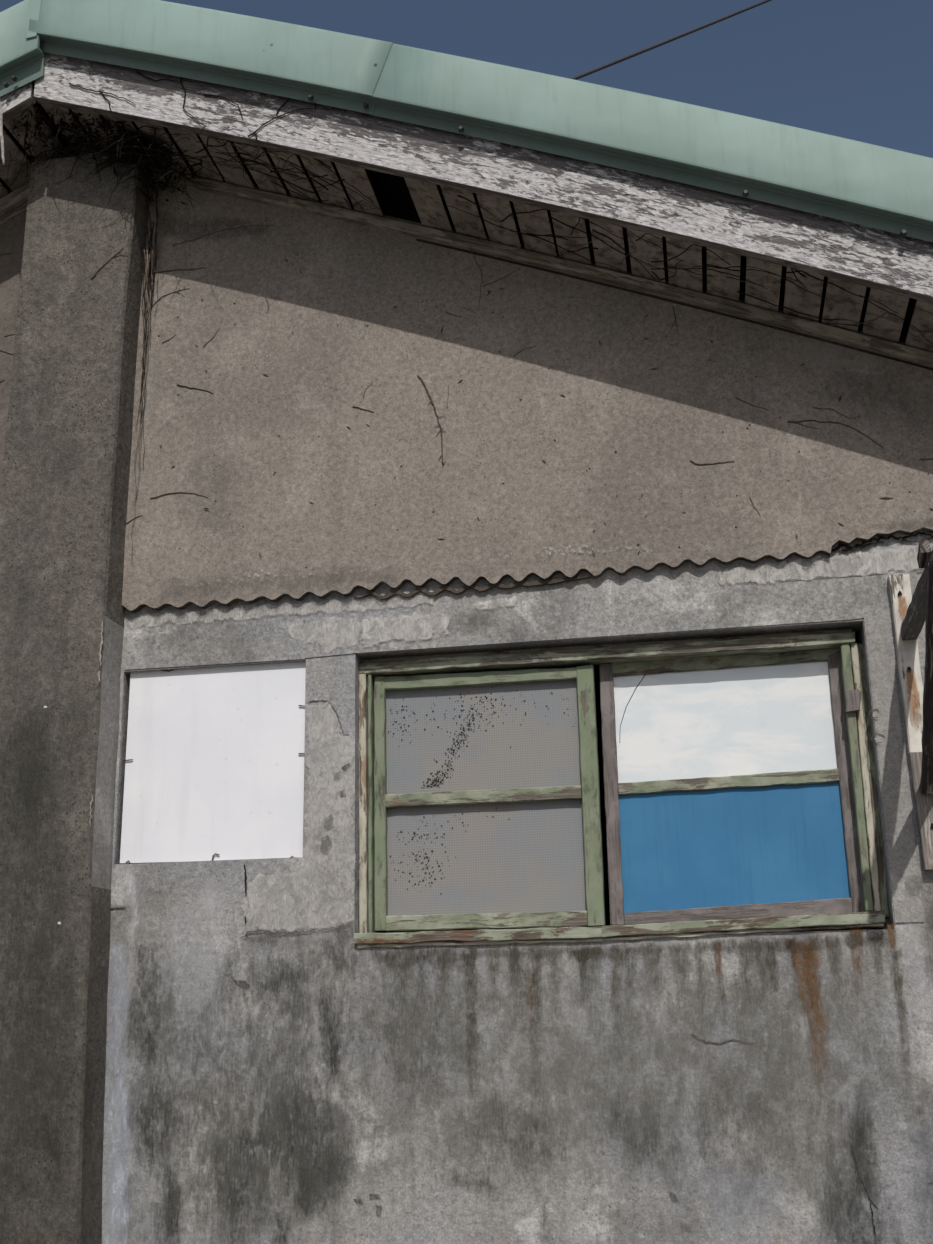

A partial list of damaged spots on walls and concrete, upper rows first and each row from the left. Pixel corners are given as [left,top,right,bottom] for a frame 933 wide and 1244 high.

crack [243,864,251,925]
leakage [104,875,354,1244]
leakage [375,943,703,1151]
corrosion [786,939,824,1054]
leakage [826,1109,880,1244]